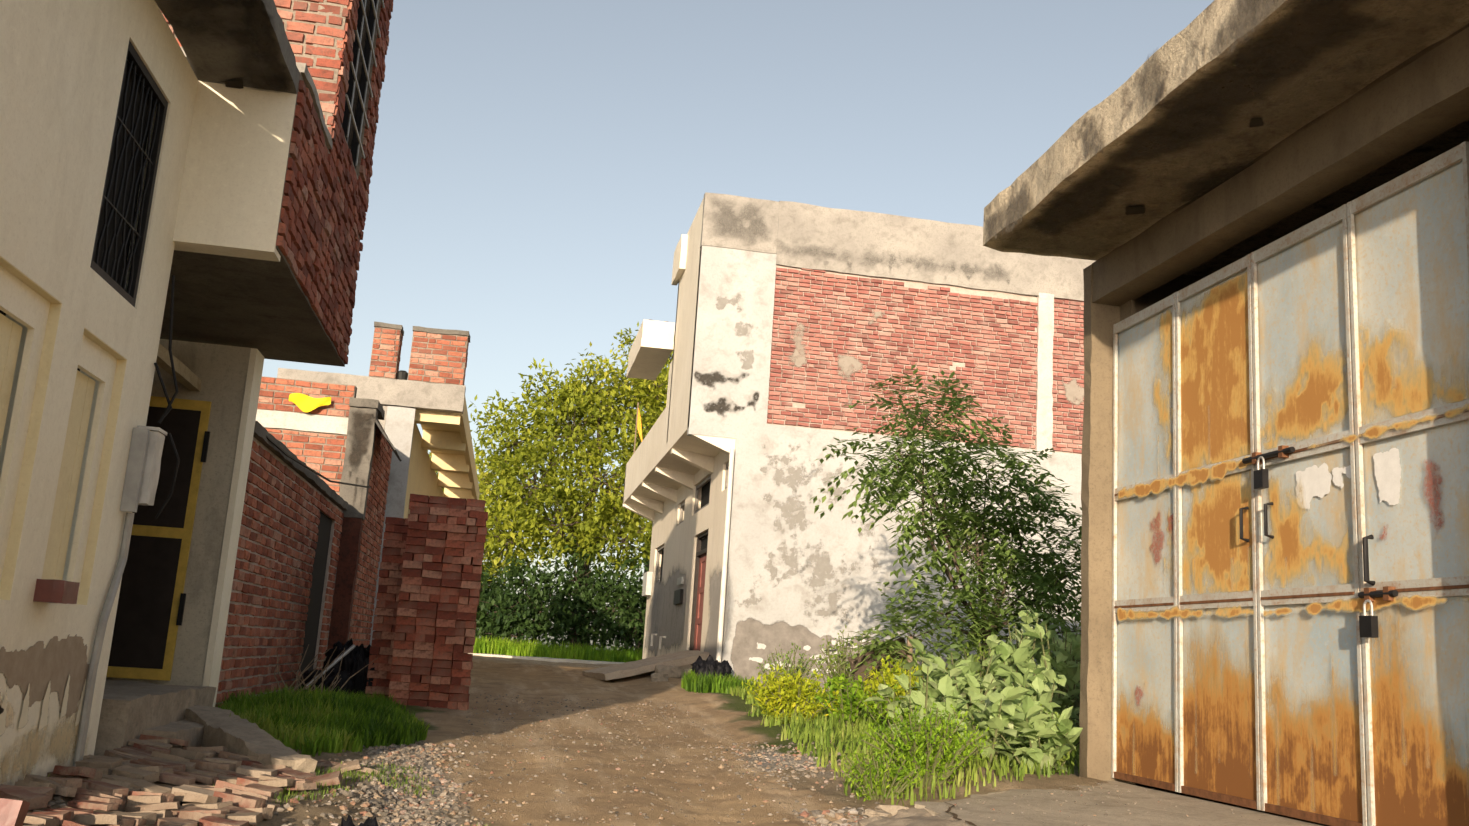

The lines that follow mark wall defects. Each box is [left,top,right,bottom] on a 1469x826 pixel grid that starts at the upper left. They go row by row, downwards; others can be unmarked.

damp [986,0,1469,257]
damp [718,203,764,242]
damp [952,265,1009,283]
mould [694,294,759,415]
flaking render [767,265,1084,455]
spalling [731,445,885,692]
corrosion [1117,272,1469,826]
peeling [0,634,89,736]
crack [944,802,977,826]